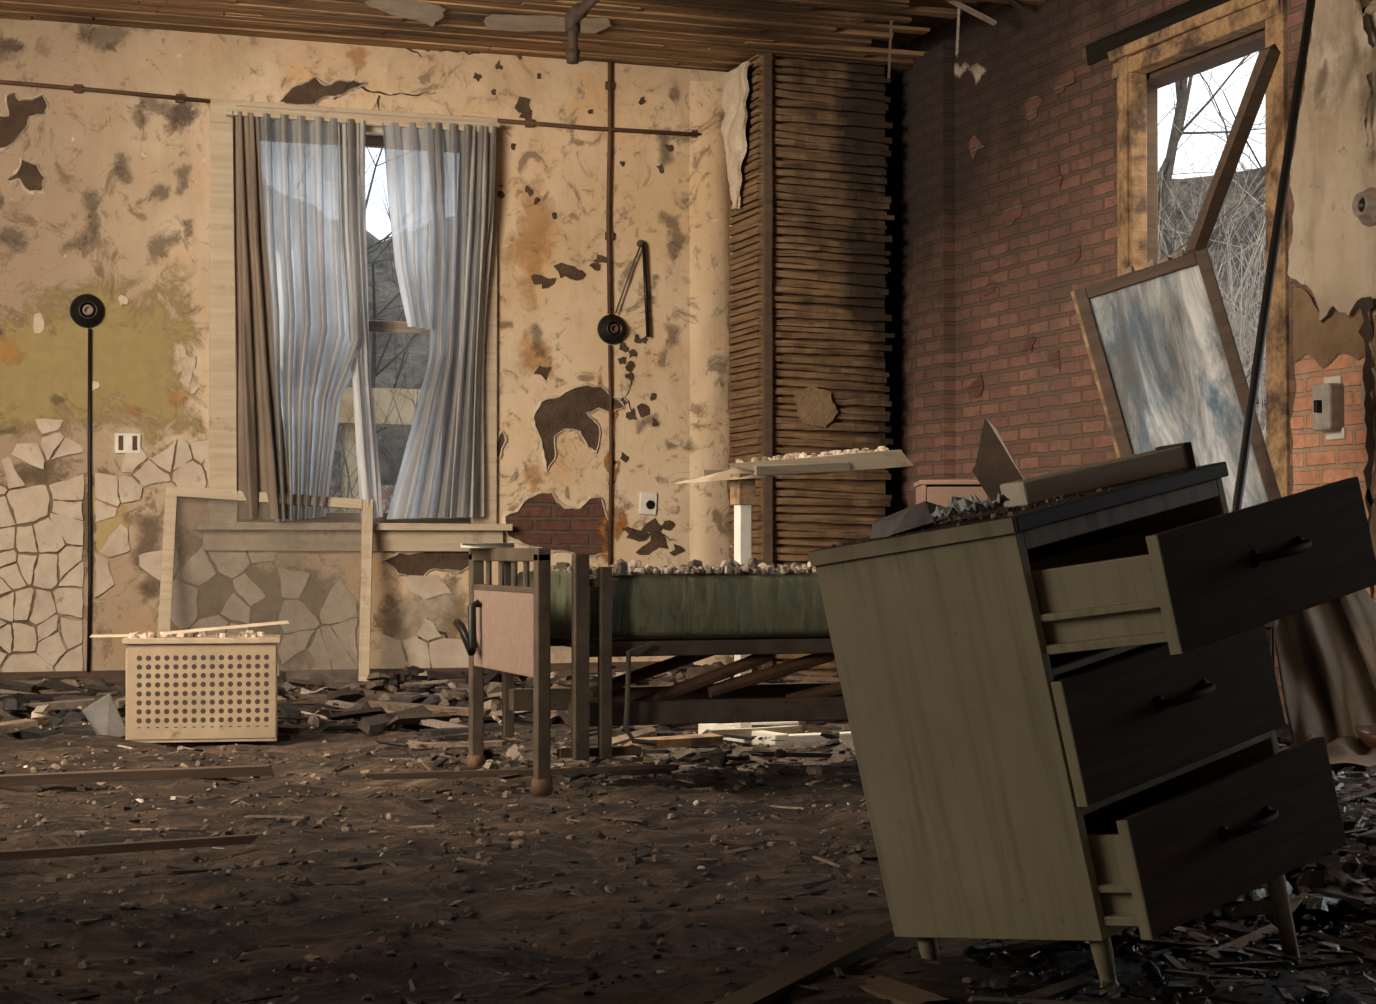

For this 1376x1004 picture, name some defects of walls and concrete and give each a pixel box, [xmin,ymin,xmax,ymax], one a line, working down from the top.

flaking render [279,77,369,106]
flaking render [0,92,50,195]
peeling [531,254,607,289]
peeling [618,334,648,381]
flaking render [531,366,659,472]
flaking render [1291,286,1376,545]
flaking render [502,491,686,559]